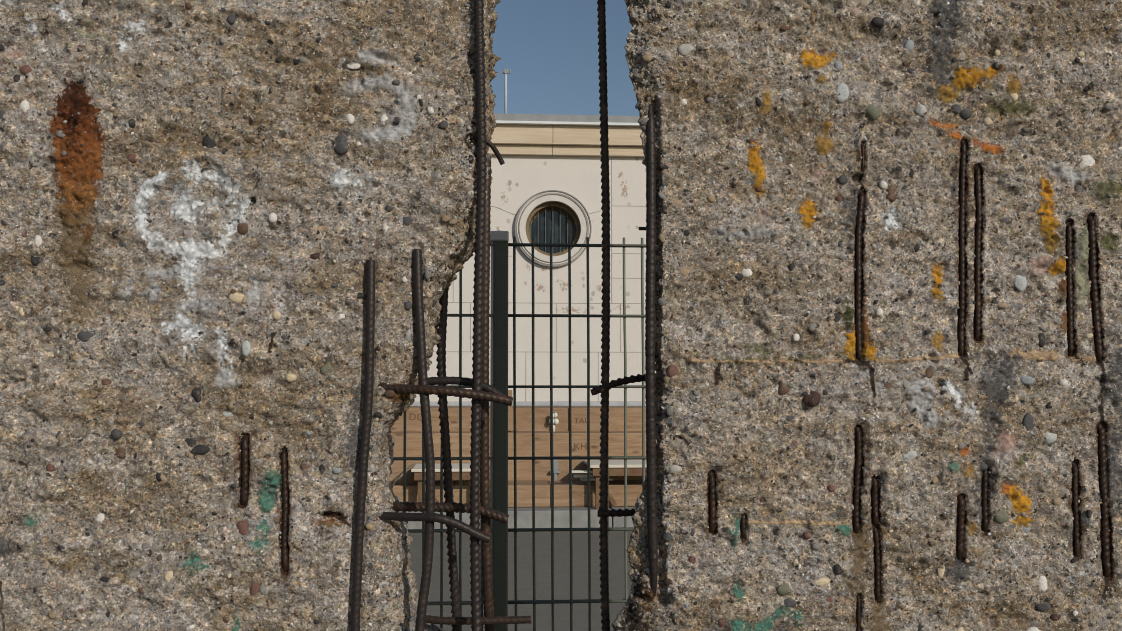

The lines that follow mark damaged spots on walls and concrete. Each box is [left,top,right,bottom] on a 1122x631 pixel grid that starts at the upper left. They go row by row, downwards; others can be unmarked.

rust [48,75,108,326]
spalling [311,0,531,631]
spalling [590,0,658,631]
rust [847,473,889,631]